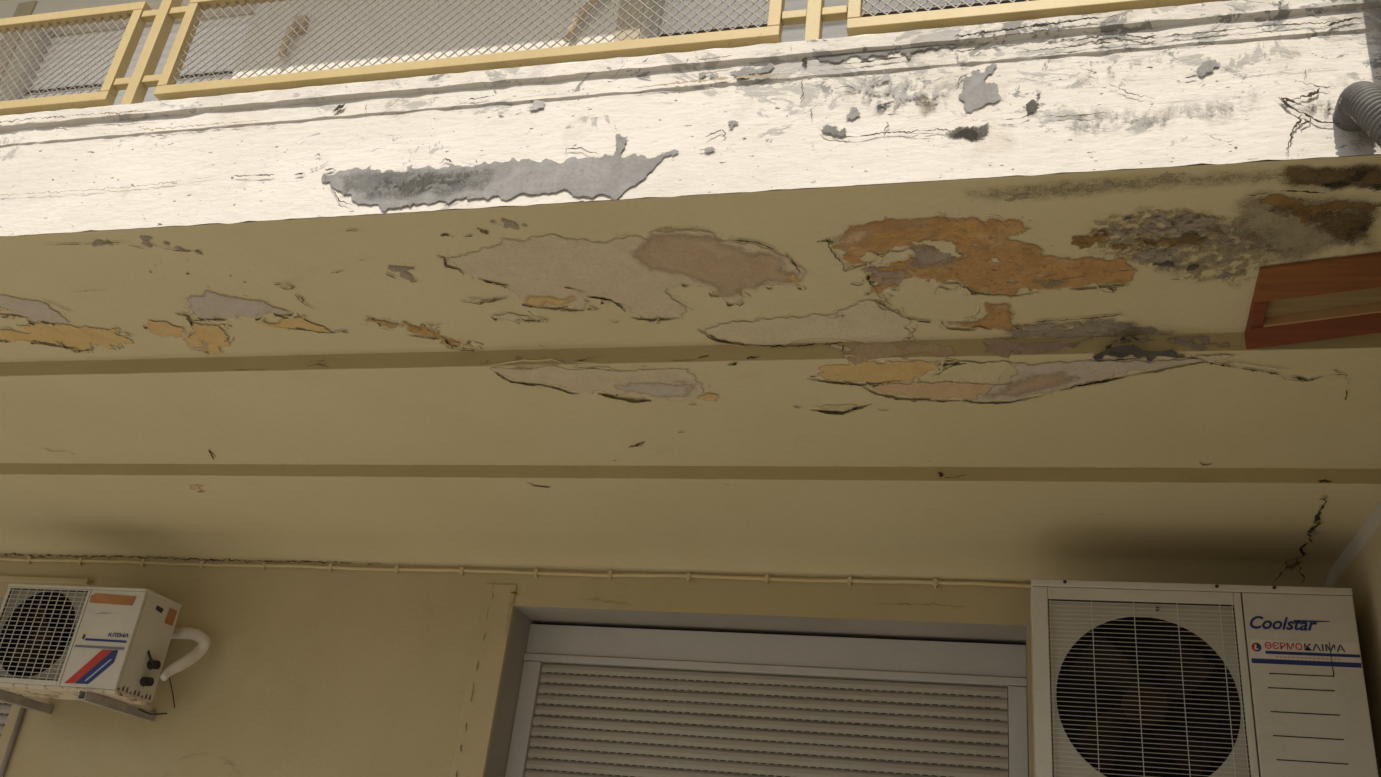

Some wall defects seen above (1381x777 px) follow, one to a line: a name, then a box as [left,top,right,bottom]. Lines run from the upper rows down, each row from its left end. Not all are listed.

spalling [802,15,1116,140]
peeling [1005,93,1234,130]
spalling [1186,59,1220,78]
crack [1279,71,1340,157]
peeling [0,275,718,406]
peeling [386,266,416,282]
spalling [295,134,679,211]
peeling [436,193,1229,405]
leakage [990,165,1381,285]
crack [1275,479,1333,584]